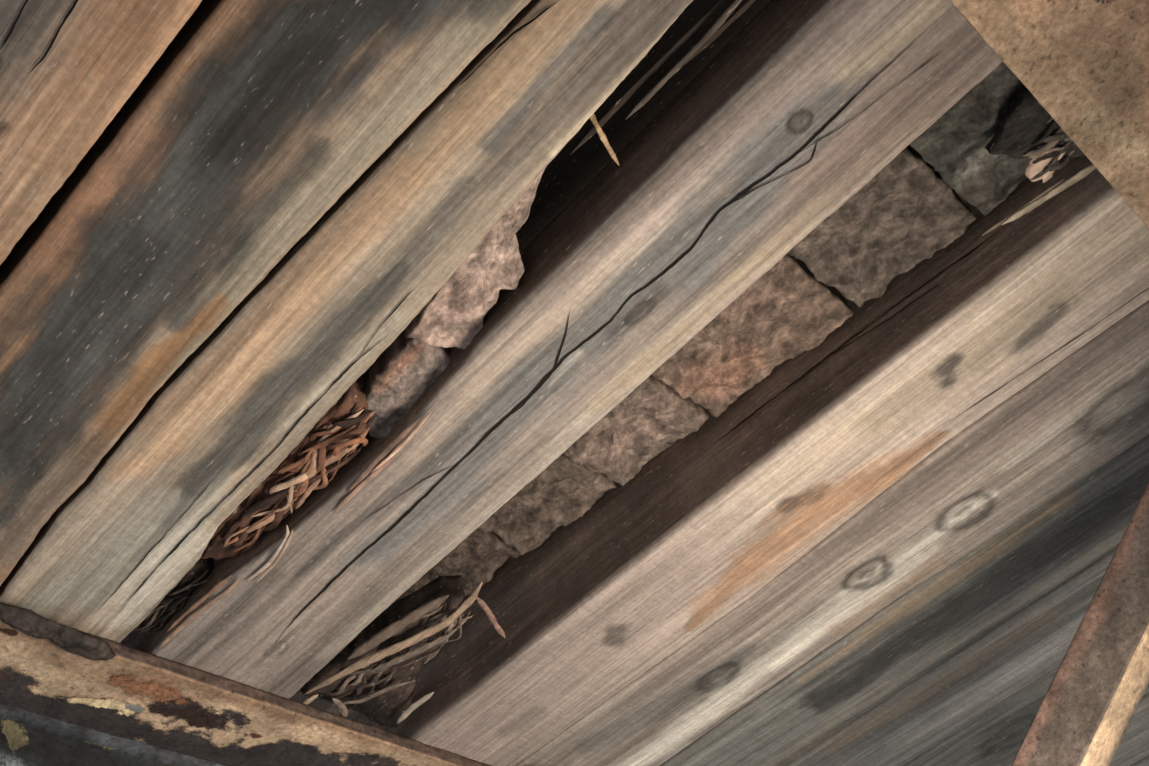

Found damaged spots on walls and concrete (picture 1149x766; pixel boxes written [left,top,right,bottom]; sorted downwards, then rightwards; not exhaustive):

crack [0,0,28,49]
crack [29,0,78,73]
water stain [0,0,498,527]
crack [275,14,944,644]
crack [713,221,1013,445]
peeling [1,718,29,752]
peeling [67,698,146,716]
corrosion [0,666,415,766]